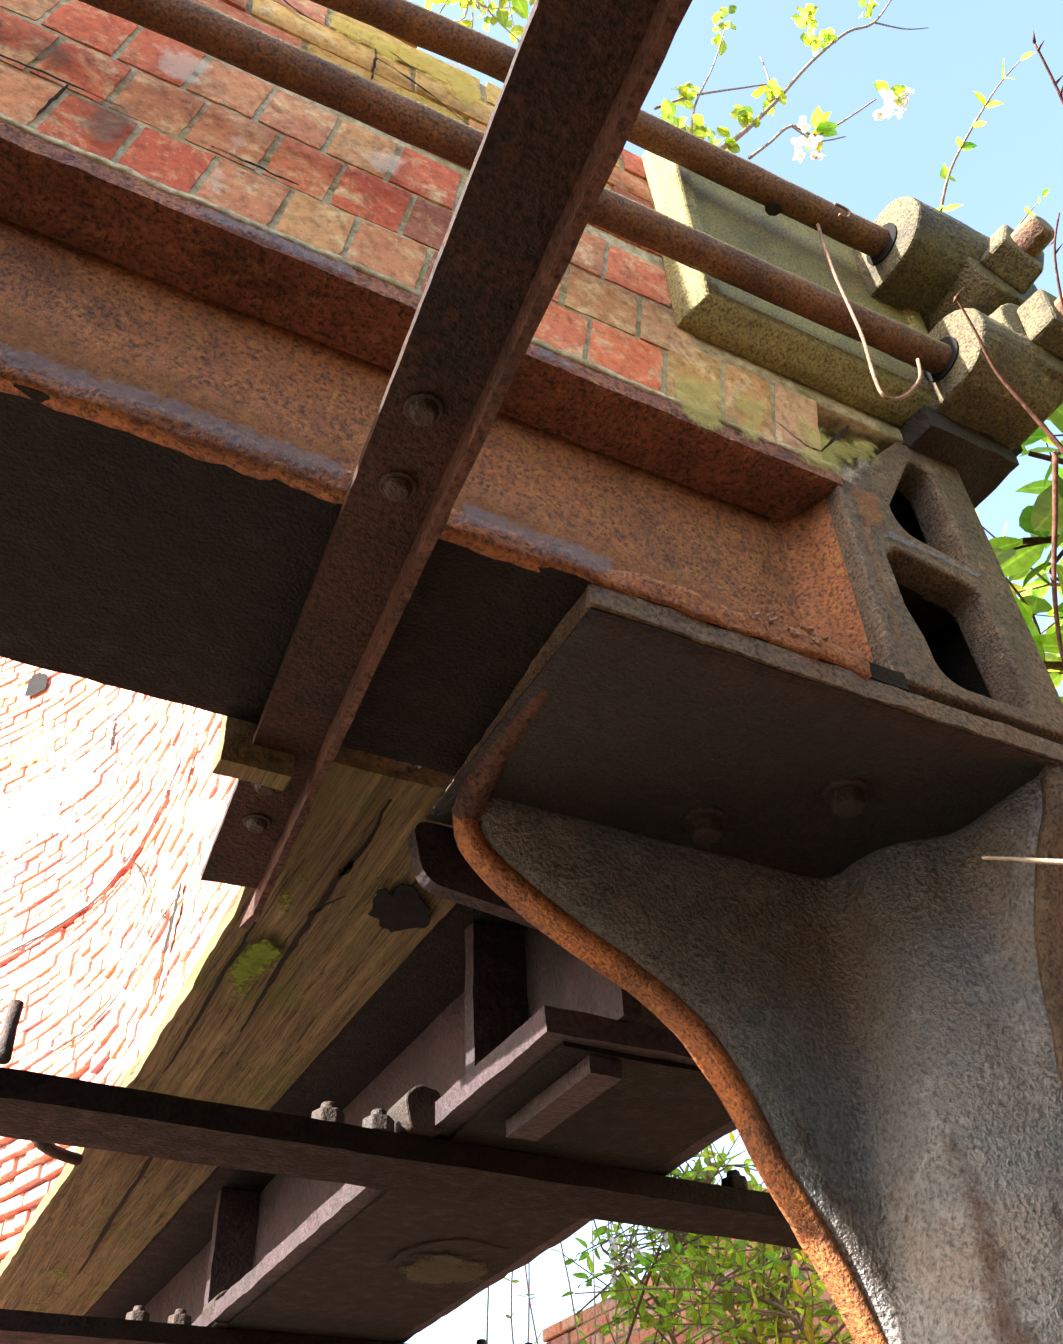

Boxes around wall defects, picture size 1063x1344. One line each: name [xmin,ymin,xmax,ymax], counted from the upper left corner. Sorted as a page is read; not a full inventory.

spalling [25,672,48,697]